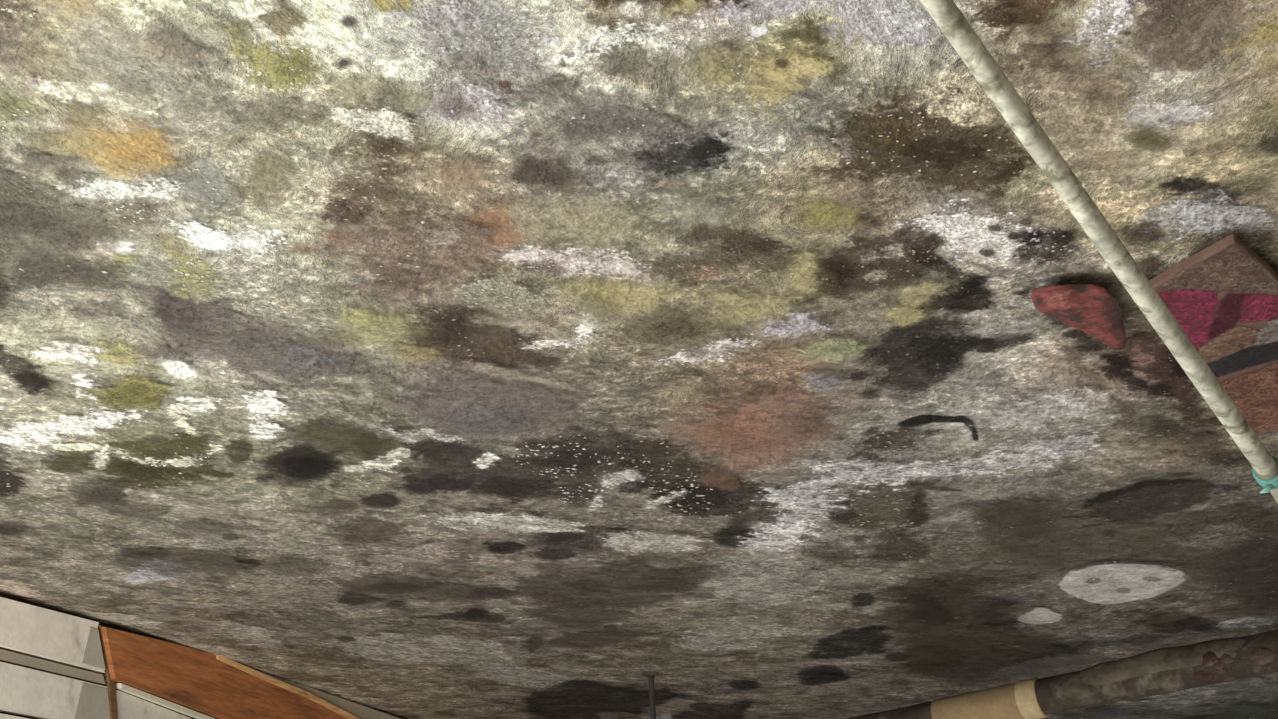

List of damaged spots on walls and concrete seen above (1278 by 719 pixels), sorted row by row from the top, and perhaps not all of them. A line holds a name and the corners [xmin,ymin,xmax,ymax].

water stain [974,0,1278,168]
water stain [1116,172,1274,252]
water stain [0,0,1101,660]
water stain [981,388,1252,469]
water stain [788,473,1278,689]
water stain [326,633,760,719]